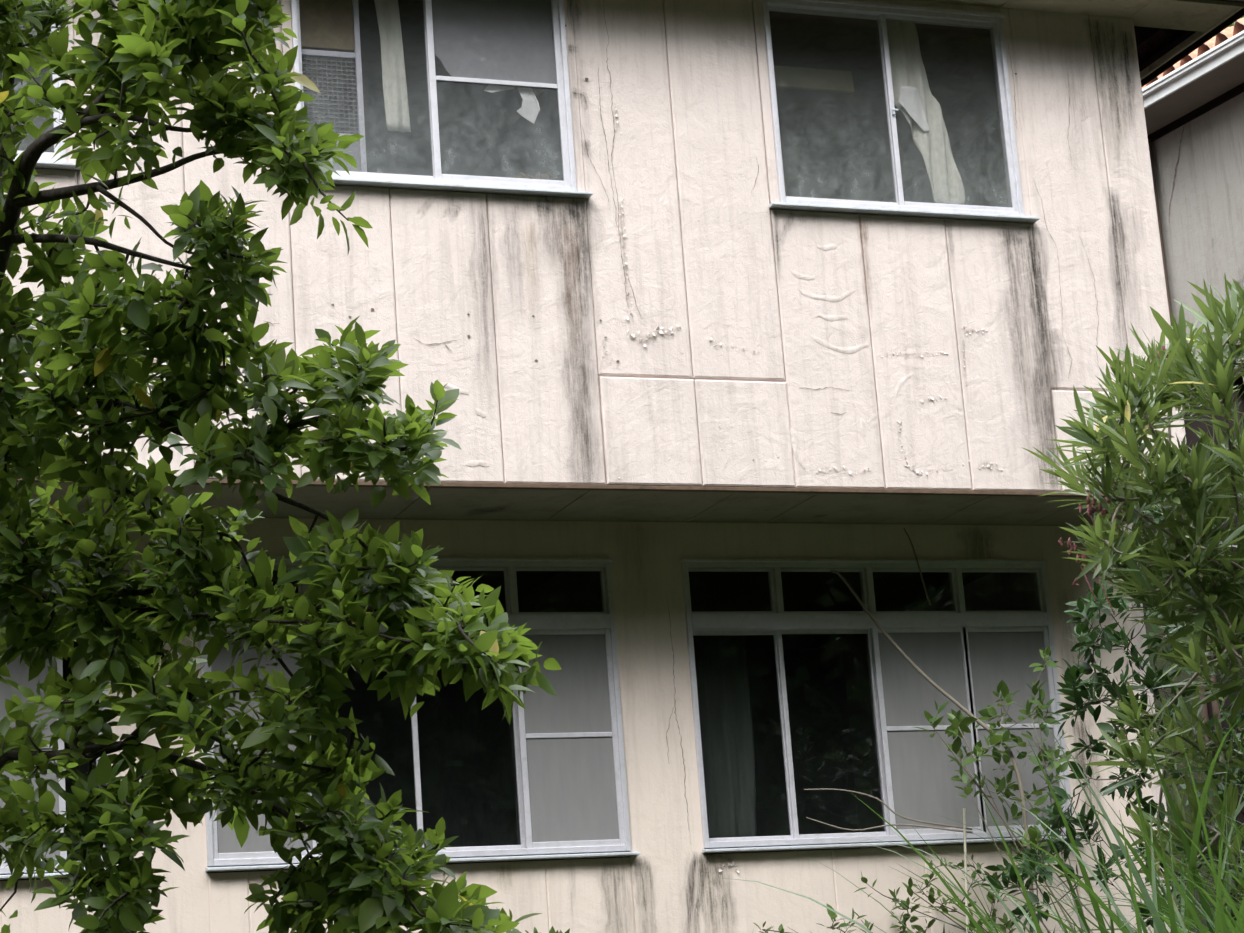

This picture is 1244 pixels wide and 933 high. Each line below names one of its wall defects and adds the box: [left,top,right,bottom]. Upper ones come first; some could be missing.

crack [582,0,641,318]
leakage [560,206,583,318]
leakage [1029,236,1047,384]
leakage [687,854,727,919]